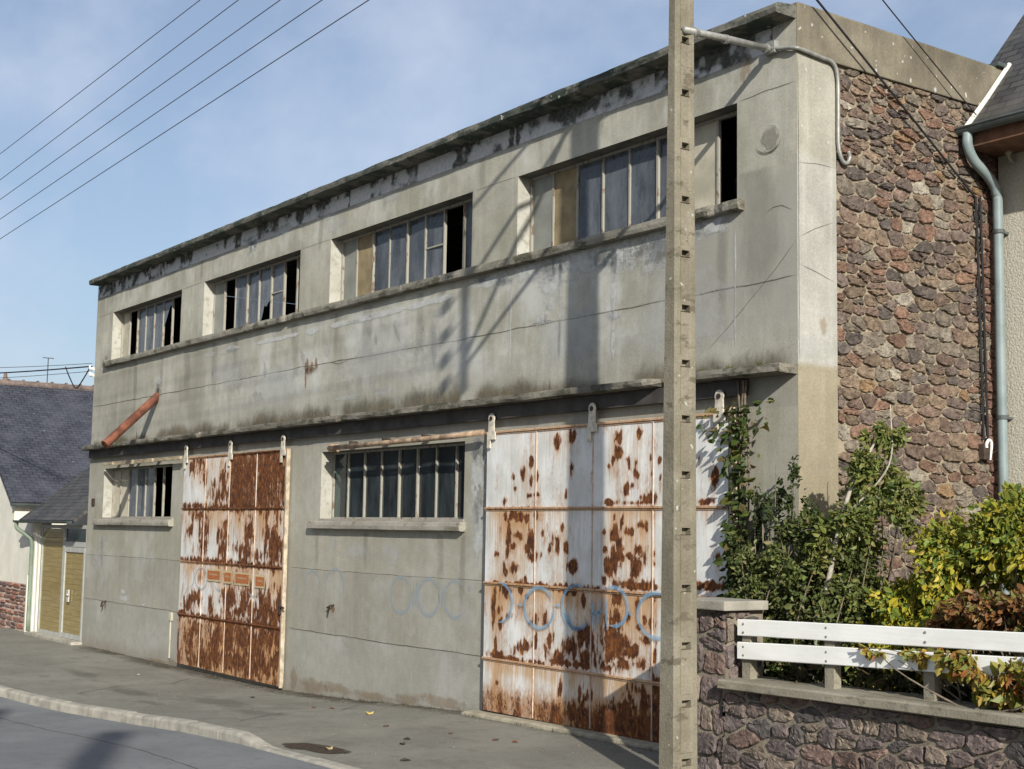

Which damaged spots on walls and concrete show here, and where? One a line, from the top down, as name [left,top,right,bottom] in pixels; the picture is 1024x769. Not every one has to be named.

water stain [694,34,755,78]
peeling [694,28,772,78]
water stain [494,68,668,152]
water stain [453,140,481,168]
peeling [98,70,668,299]